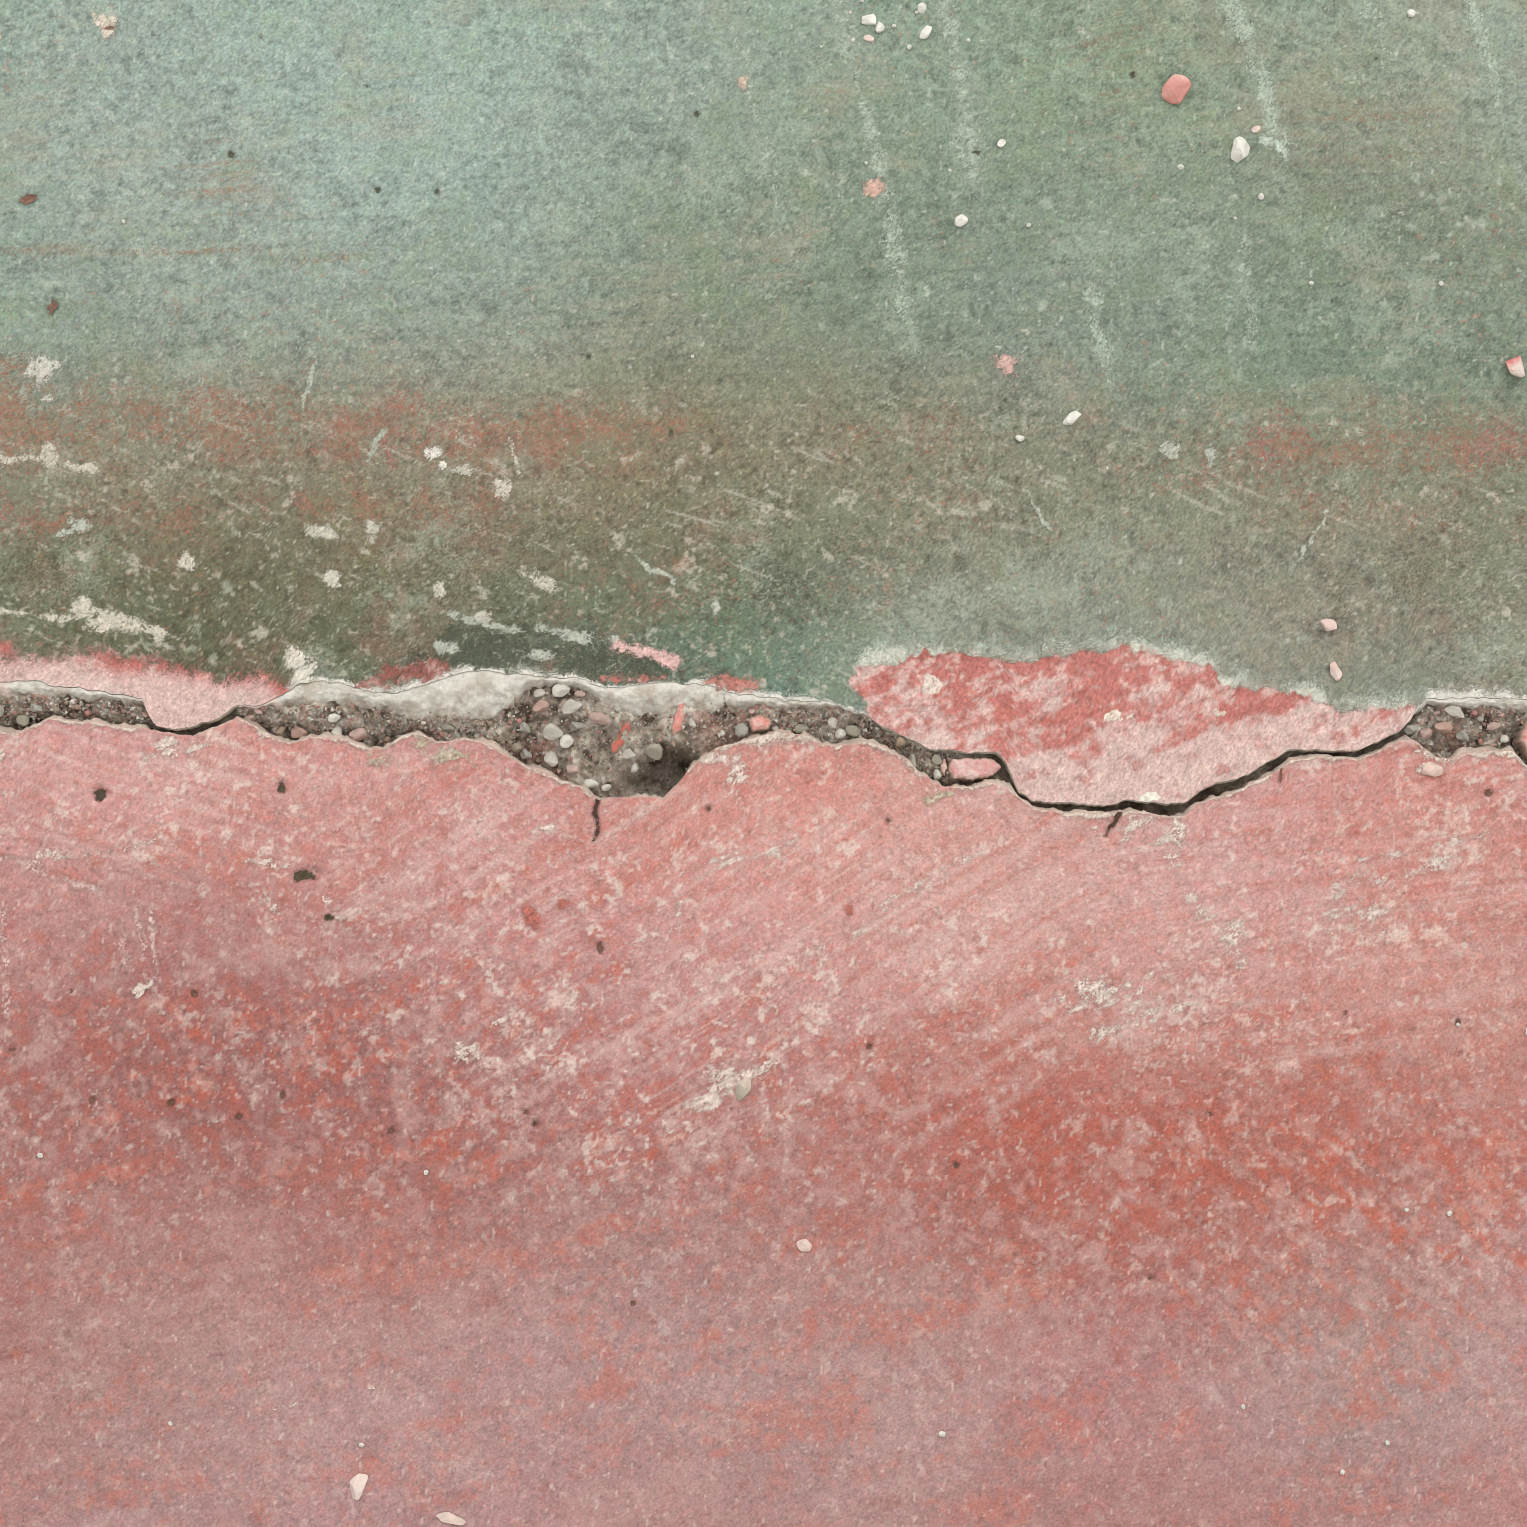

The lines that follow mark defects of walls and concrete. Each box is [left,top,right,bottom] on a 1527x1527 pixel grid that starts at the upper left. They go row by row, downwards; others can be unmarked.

crack [156,708,238,736]
crack [592,799,601,841]
peeling [0,634,1527,820]
crack [958,724,1407,837]